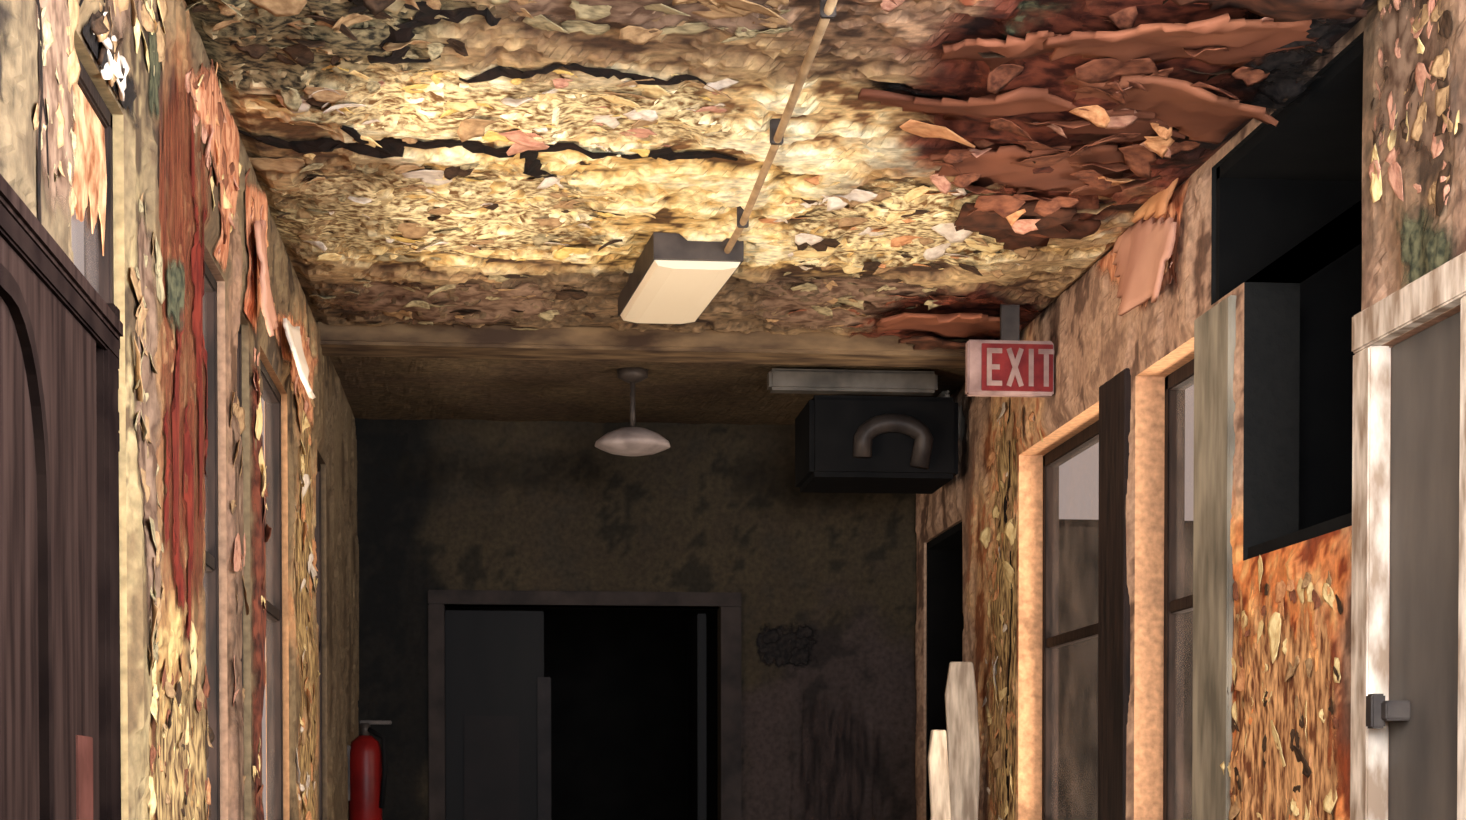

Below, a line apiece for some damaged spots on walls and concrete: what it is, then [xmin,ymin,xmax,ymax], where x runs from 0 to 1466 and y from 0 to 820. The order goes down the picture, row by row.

peeling [489,0,794,45]
peeling [880,0,921,12]
crack [238,125,738,178]
spalling [1216,0,1462,302]
flaking render [1097,178,1190,316]
peeling [33,0,742,820]
peeling [1220,243,1362,820]